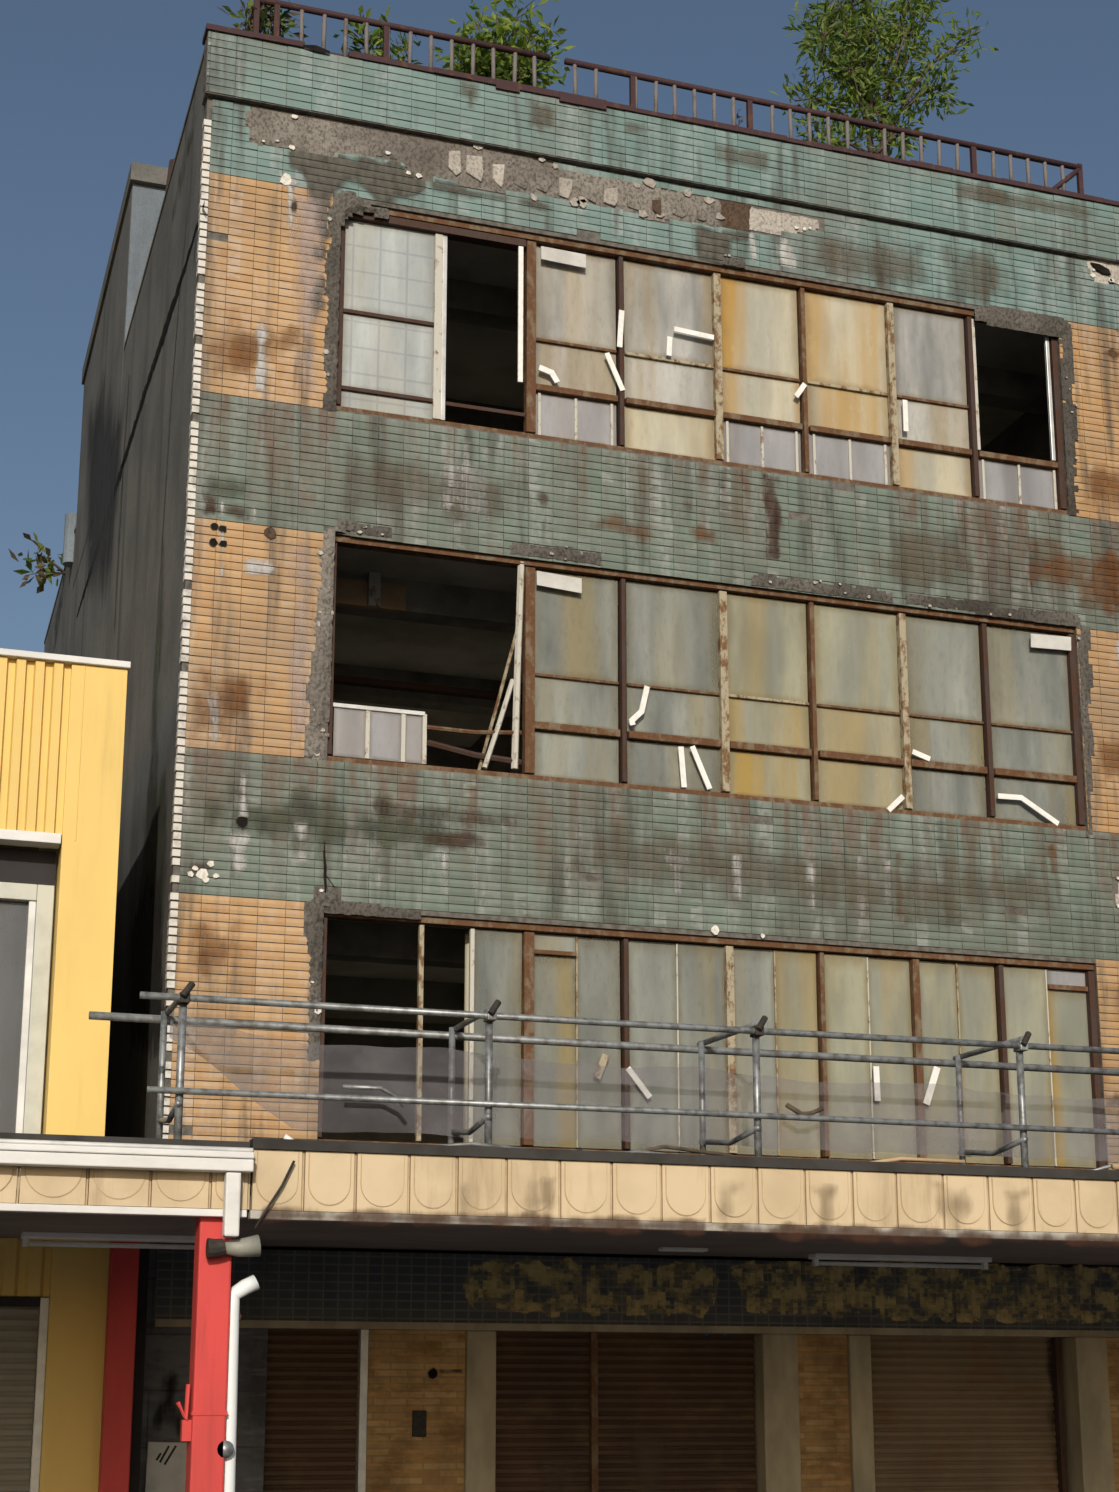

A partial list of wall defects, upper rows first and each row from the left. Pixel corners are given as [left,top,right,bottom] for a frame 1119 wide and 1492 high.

spalling [245,106,819,235]
spalling [1085,259,1119,285]
damp [255,325,267,390]
damp [147,582,162,813]
damp [230,834,249,870]
damp [130,880,162,1056]